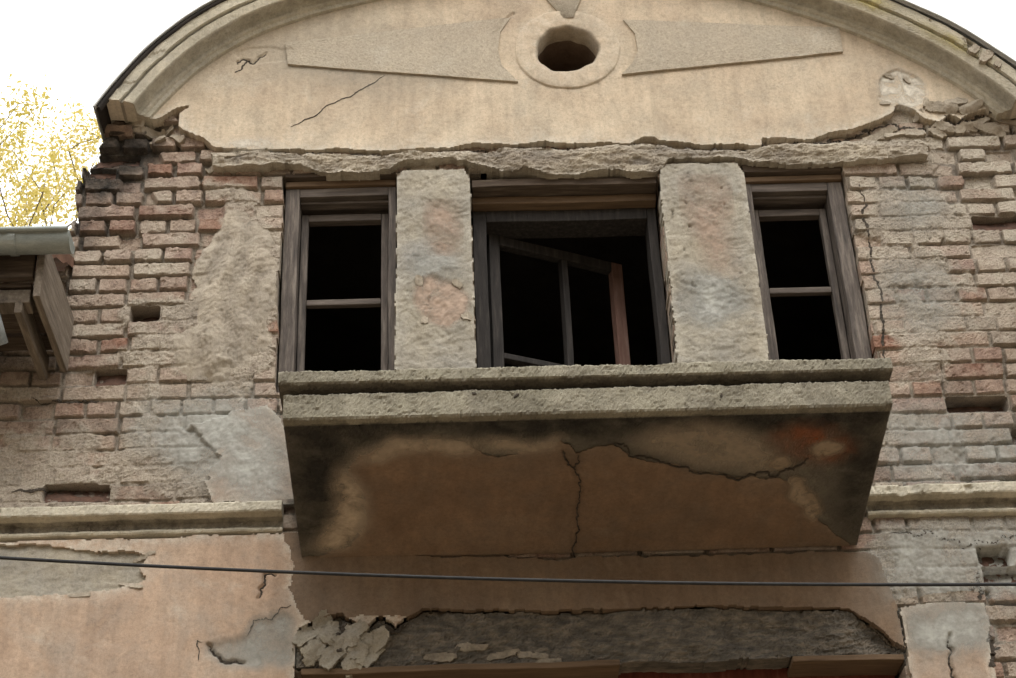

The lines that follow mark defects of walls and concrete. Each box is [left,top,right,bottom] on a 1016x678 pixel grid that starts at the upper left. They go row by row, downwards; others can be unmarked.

crack [291,75,385,127]
spalling [862,71,1016,141]
spalling [104,119,185,149]
crack [667,111,992,151]
crack [615,442,809,482]
spalling [44,491,110,503]
peeling [0,545,156,598]
crack [247,573,291,636]
crack [196,640,242,665]
spalling [292,609,404,678]
peeling [423,642,562,663]
crack [946,641,954,678]